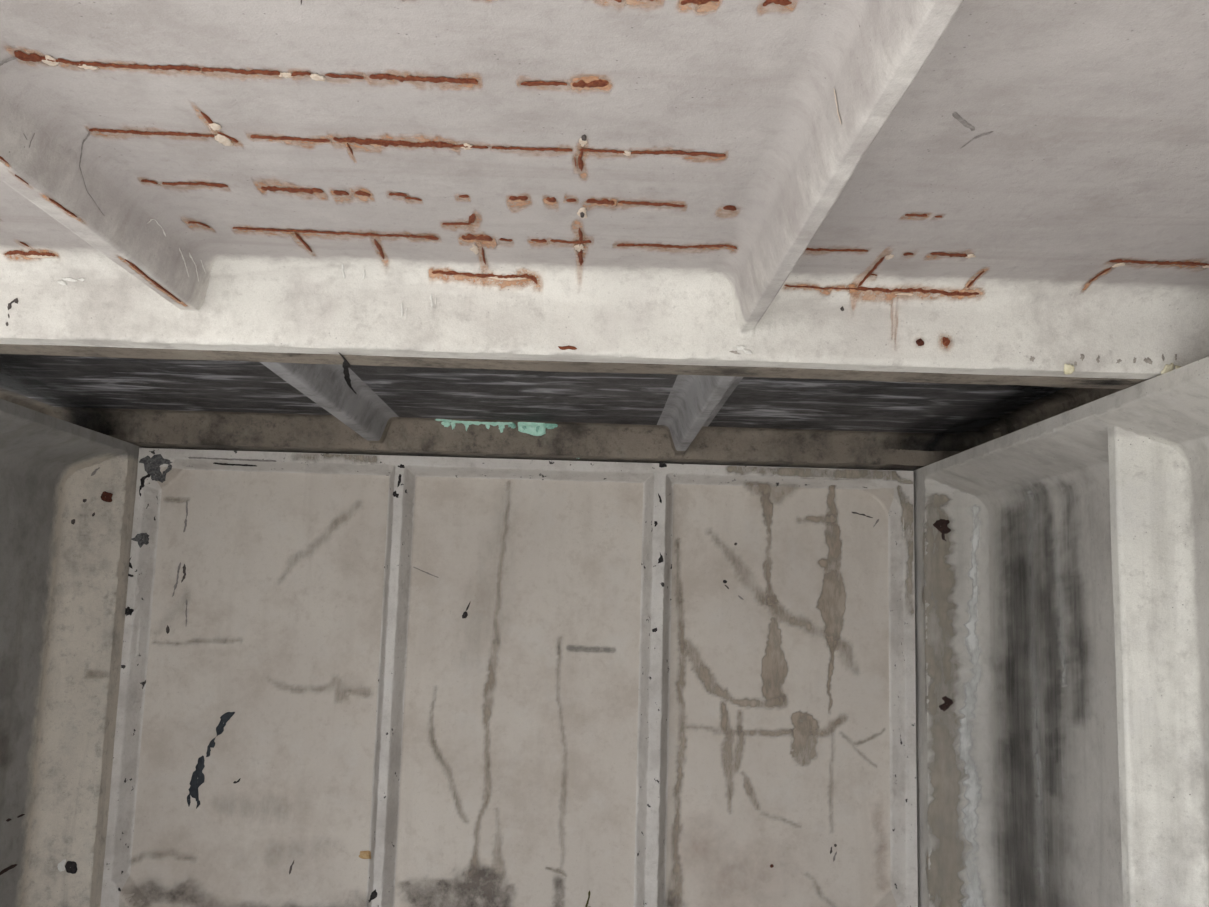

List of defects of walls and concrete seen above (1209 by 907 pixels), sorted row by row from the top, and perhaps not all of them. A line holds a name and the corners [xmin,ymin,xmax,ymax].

water stain [898,385,1062,452]
peeling [139,454,172,496]
water stain [484,664,495,727]
water stain [667,465,984,907]
water stain [1069,576,1087,716]
peeling [187,712,235,809]